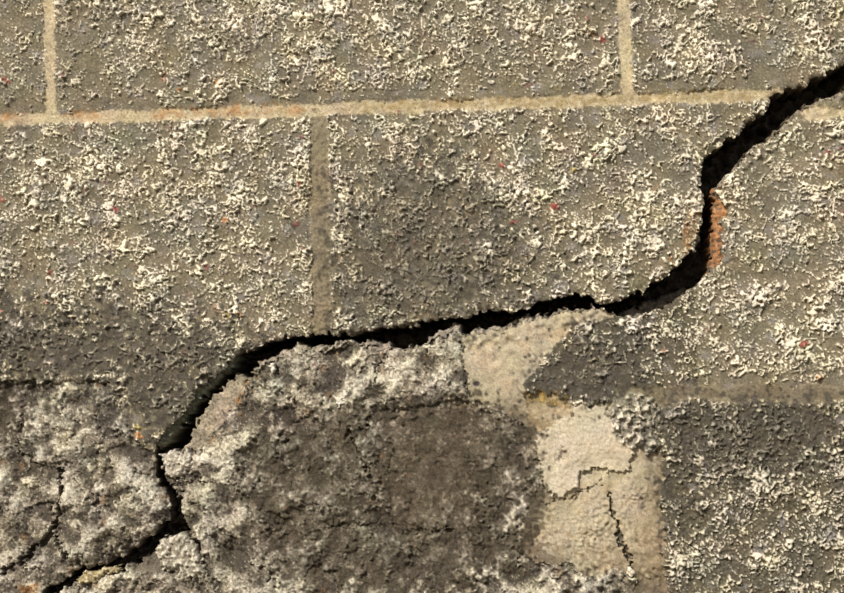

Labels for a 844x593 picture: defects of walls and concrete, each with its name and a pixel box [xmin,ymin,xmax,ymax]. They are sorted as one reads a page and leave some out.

crack [91,64,844,569]
crack [15,397,39,466]
spalling [0,308,668,593]
crack [0,466,69,577]
crack [42,565,88,593]
crack [195,539,211,578]